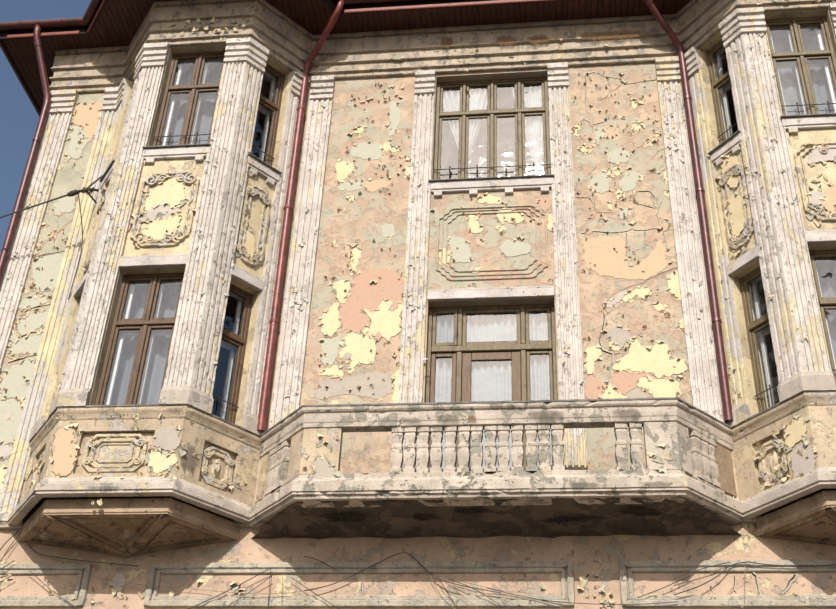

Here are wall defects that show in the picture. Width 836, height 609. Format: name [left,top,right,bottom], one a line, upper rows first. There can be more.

peeling [57,102,103,171]
peeling [95,174,196,251]
peeling [372,221,397,259]
peeling [438,135,569,287]
peeling [556,71,692,399]
crack [576,167,678,384]
peeling [715,153,774,269]
peeling [776,169,836,227]
peeling [316,239,425,404]
peeling [114,413,198,479]
peeling [764,415,818,486]
spalling [223,581,255,600]